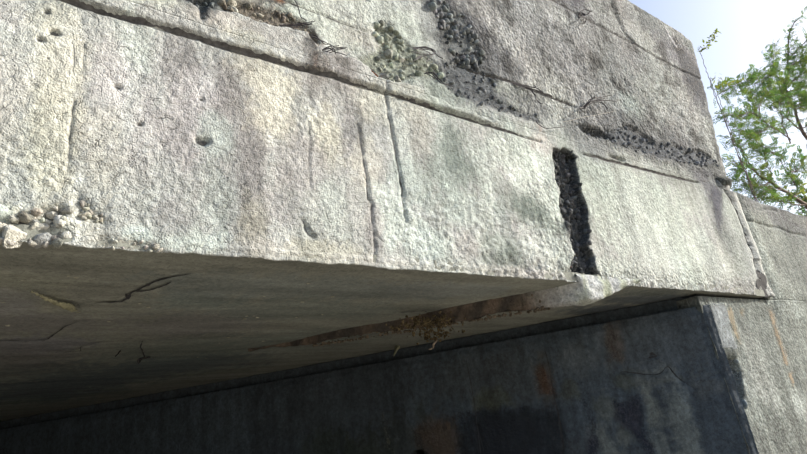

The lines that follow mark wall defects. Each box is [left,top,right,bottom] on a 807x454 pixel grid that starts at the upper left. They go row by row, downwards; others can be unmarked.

crack [62,0,538,222]
spalling [371,0,538,123]
leakage [665,27,706,101]
spalling [0,200,104,249]
crack [96,273,193,303]
crack [358,129,385,255]
spalling [248,149,641,352]